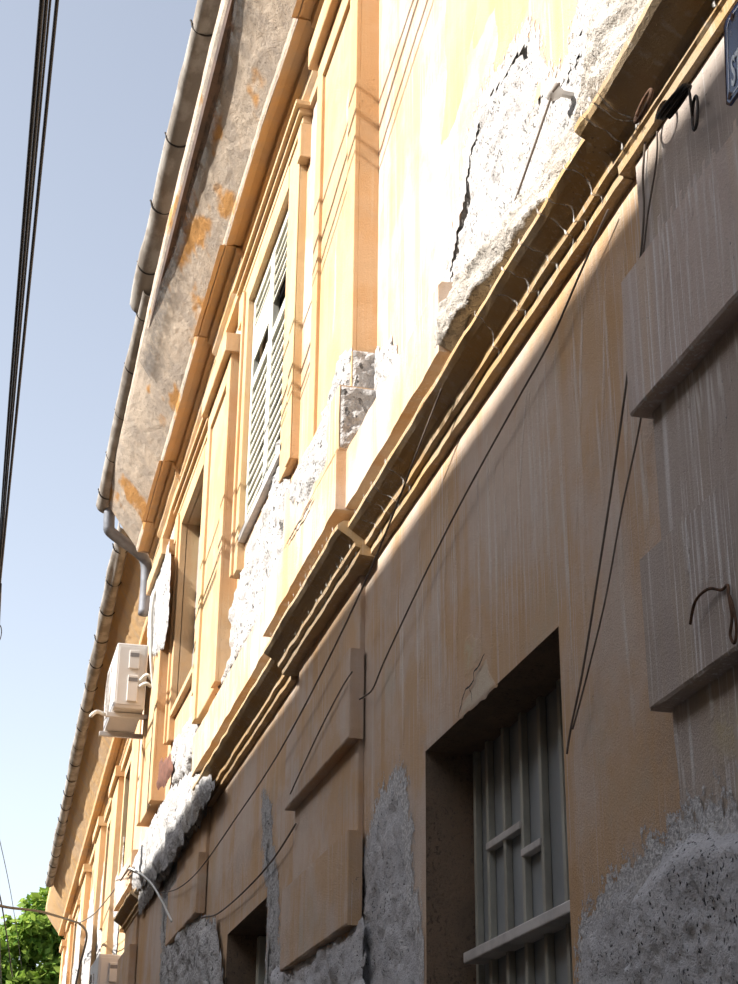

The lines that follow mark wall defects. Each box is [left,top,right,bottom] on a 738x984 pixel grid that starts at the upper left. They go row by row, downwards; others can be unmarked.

spalling [442,0,599,282]
spalling [147,543,171,655]
spalling [216,335,399,695]
peeling [461,633,498,719]
spalling [61,713,223,984]
spalling [260,755,424,984]
spalling [573,755,738,984]